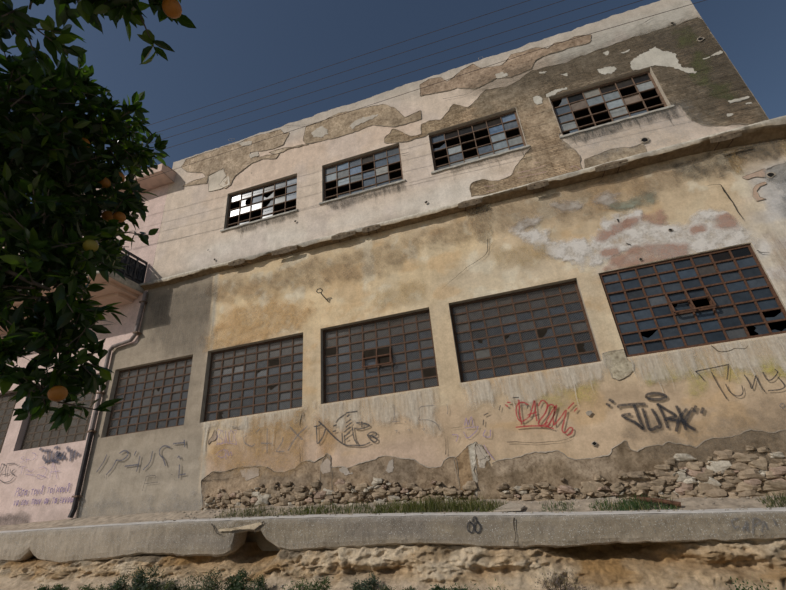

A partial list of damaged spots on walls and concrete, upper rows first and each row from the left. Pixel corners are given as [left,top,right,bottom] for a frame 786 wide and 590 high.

flaking render [181,17,769,211]
crack [708,184,743,219]
flaking render [742,168,776,201]
spalling [201,429,786,509]